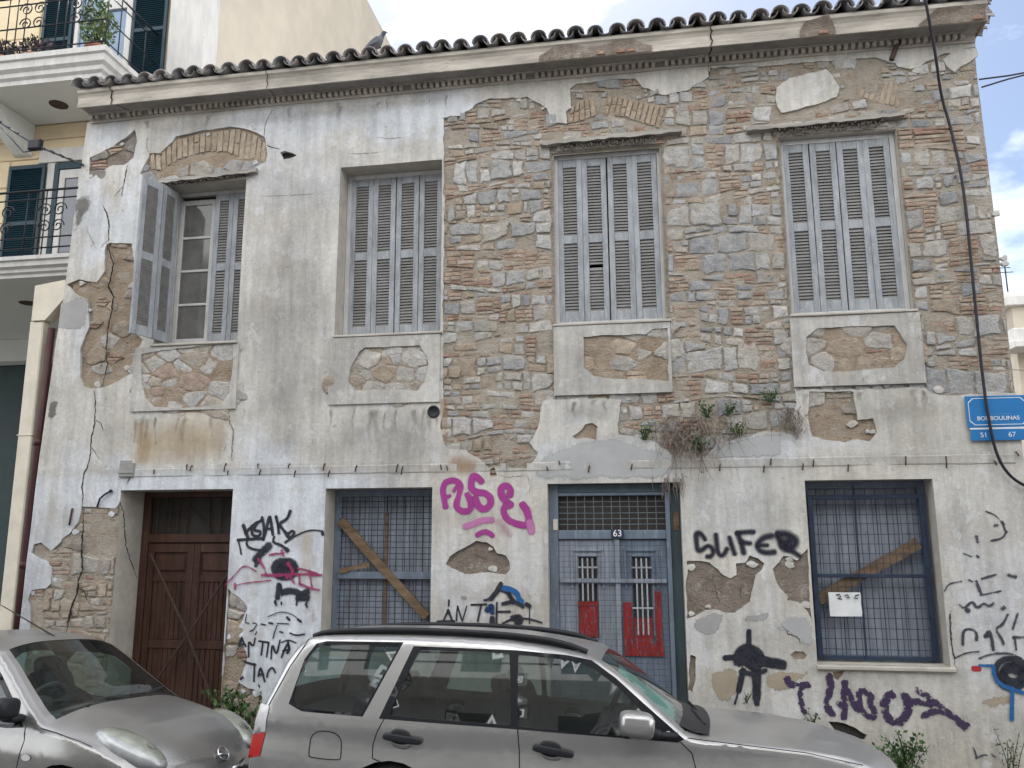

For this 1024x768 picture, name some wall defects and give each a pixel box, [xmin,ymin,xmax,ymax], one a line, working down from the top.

flaking render [89,132,137,179]
flaking render [141,128,267,180]
crack [67,138,149,629]
flaking render [73,243,248,421]
flaking render [322,375,334,394]
flaking render [349,53,1015,477]
flaking render [29,502,121,655]
flaking render [221,590,262,730]
flaking render [446,541,510,575]
flaking render [686,550,811,635]